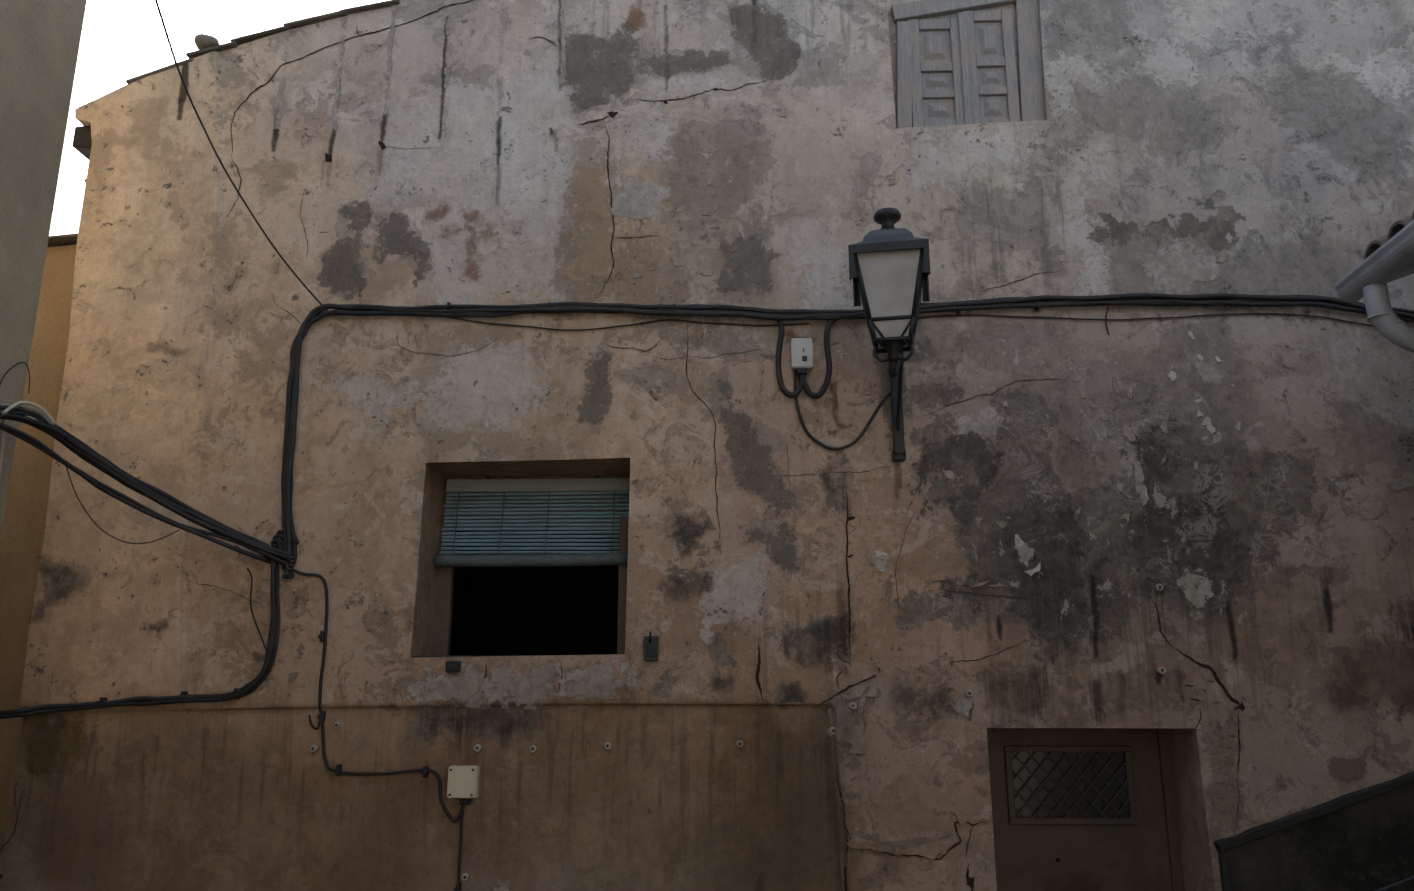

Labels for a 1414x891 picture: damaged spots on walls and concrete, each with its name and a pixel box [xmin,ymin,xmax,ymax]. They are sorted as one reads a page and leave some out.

crack [227,0,473,216]
crack [580,80,766,299]
crack [604,319,764,554]
peeling [1188,331,1235,440]
spalling [399,658,642,711]
peeling [991,516,1041,576]
peeling [1120,459,1149,529]
peeling [1176,534,1214,608]
crack [1155,603,1245,836]
water stain [1226,602,1237,658]
water stain [1324,590,1332,632]
crack [835,755,990,891]